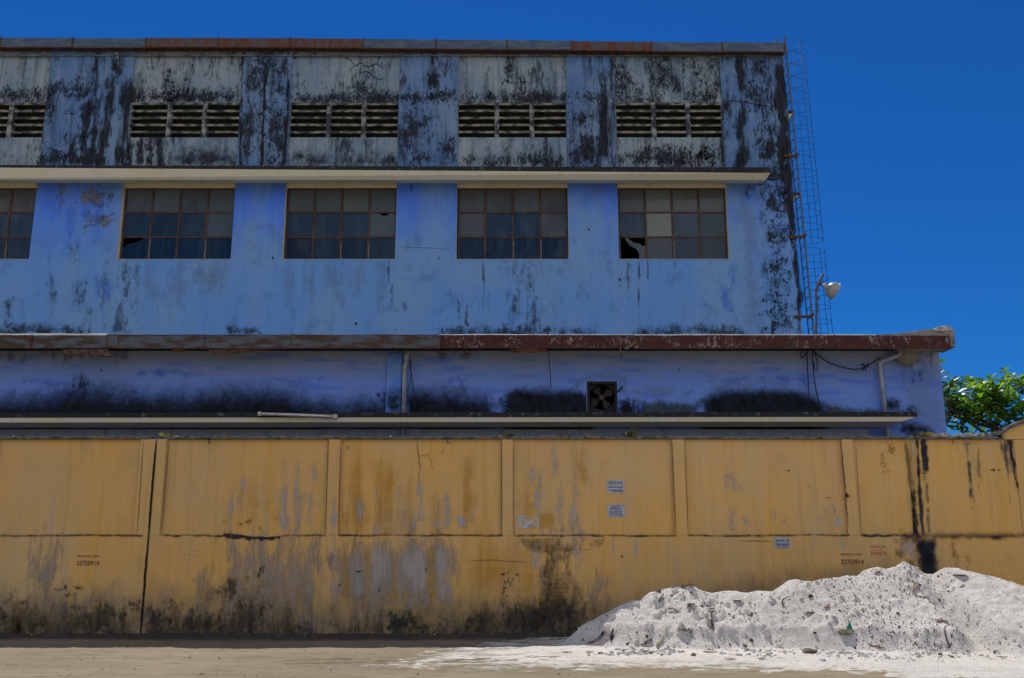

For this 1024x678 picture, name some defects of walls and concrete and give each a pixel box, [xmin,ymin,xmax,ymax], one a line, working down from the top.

crack [345,54,387,87]
damp [0,52,804,335]
rust [0,347,440,357]
damp [0,376,590,413]
damp [1001,439,1019,488]
crack [137,439,169,633]
damp [54,579,272,633]